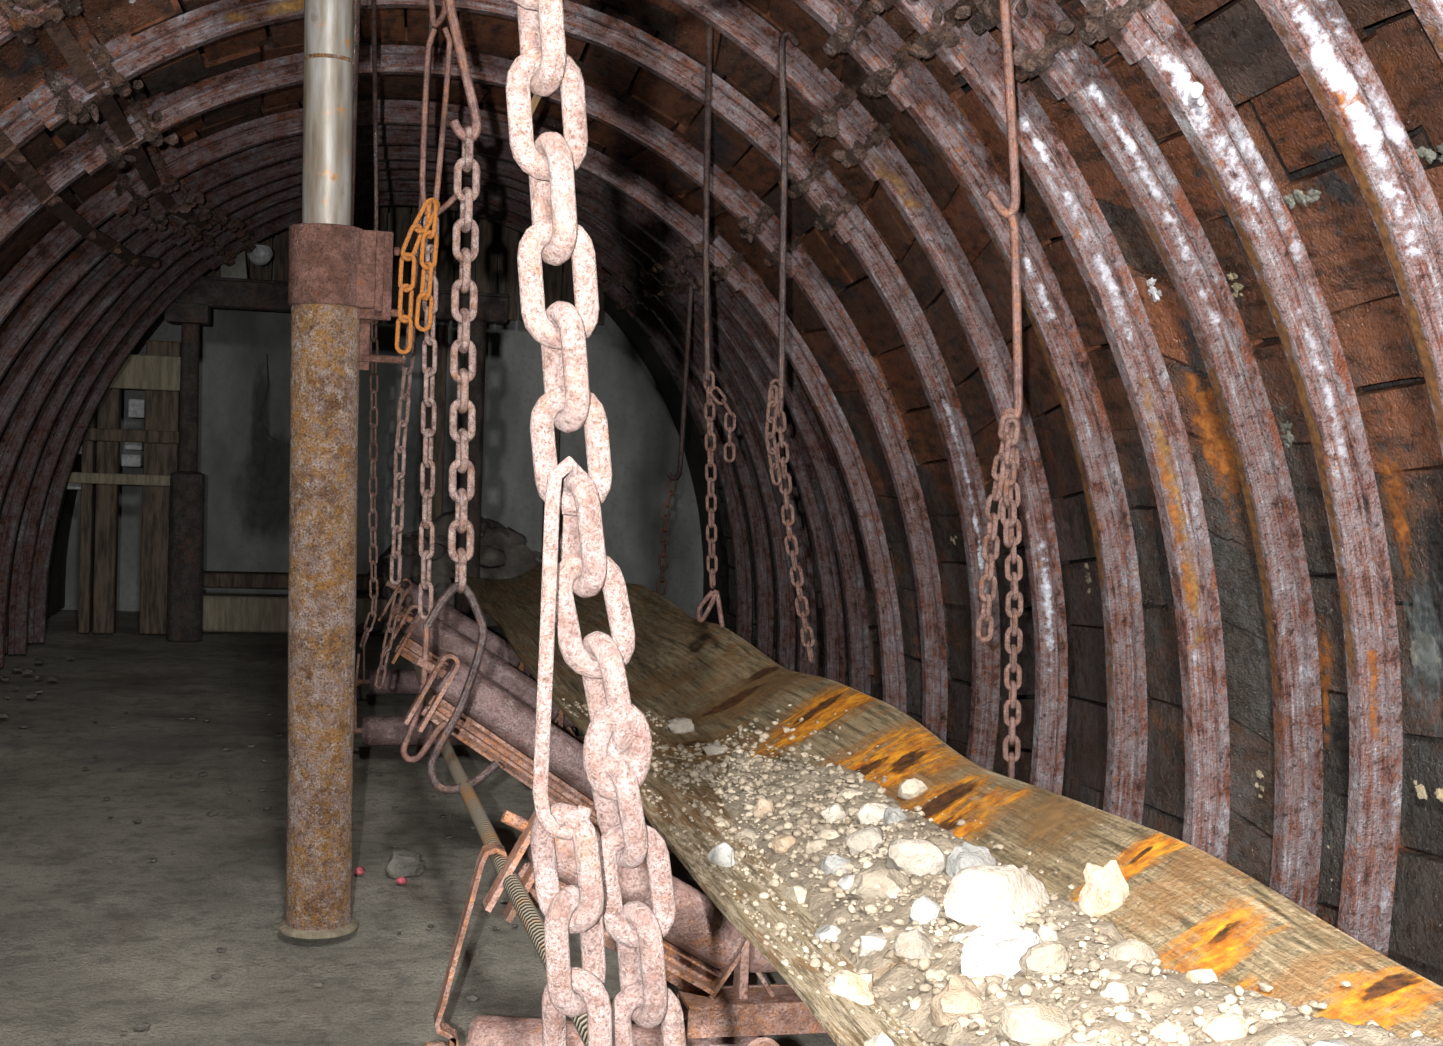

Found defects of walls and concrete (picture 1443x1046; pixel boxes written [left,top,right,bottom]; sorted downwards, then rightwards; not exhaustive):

leakage [1149,42,1277,208]
leakage [1293,0,1405,216]
rust [1156,425,1186,542]
rust [1182,562,1199,616]
rust [1187,347,1279,762]
rust [1200,149,1378,741]
leakage [1305,329,1347,469]